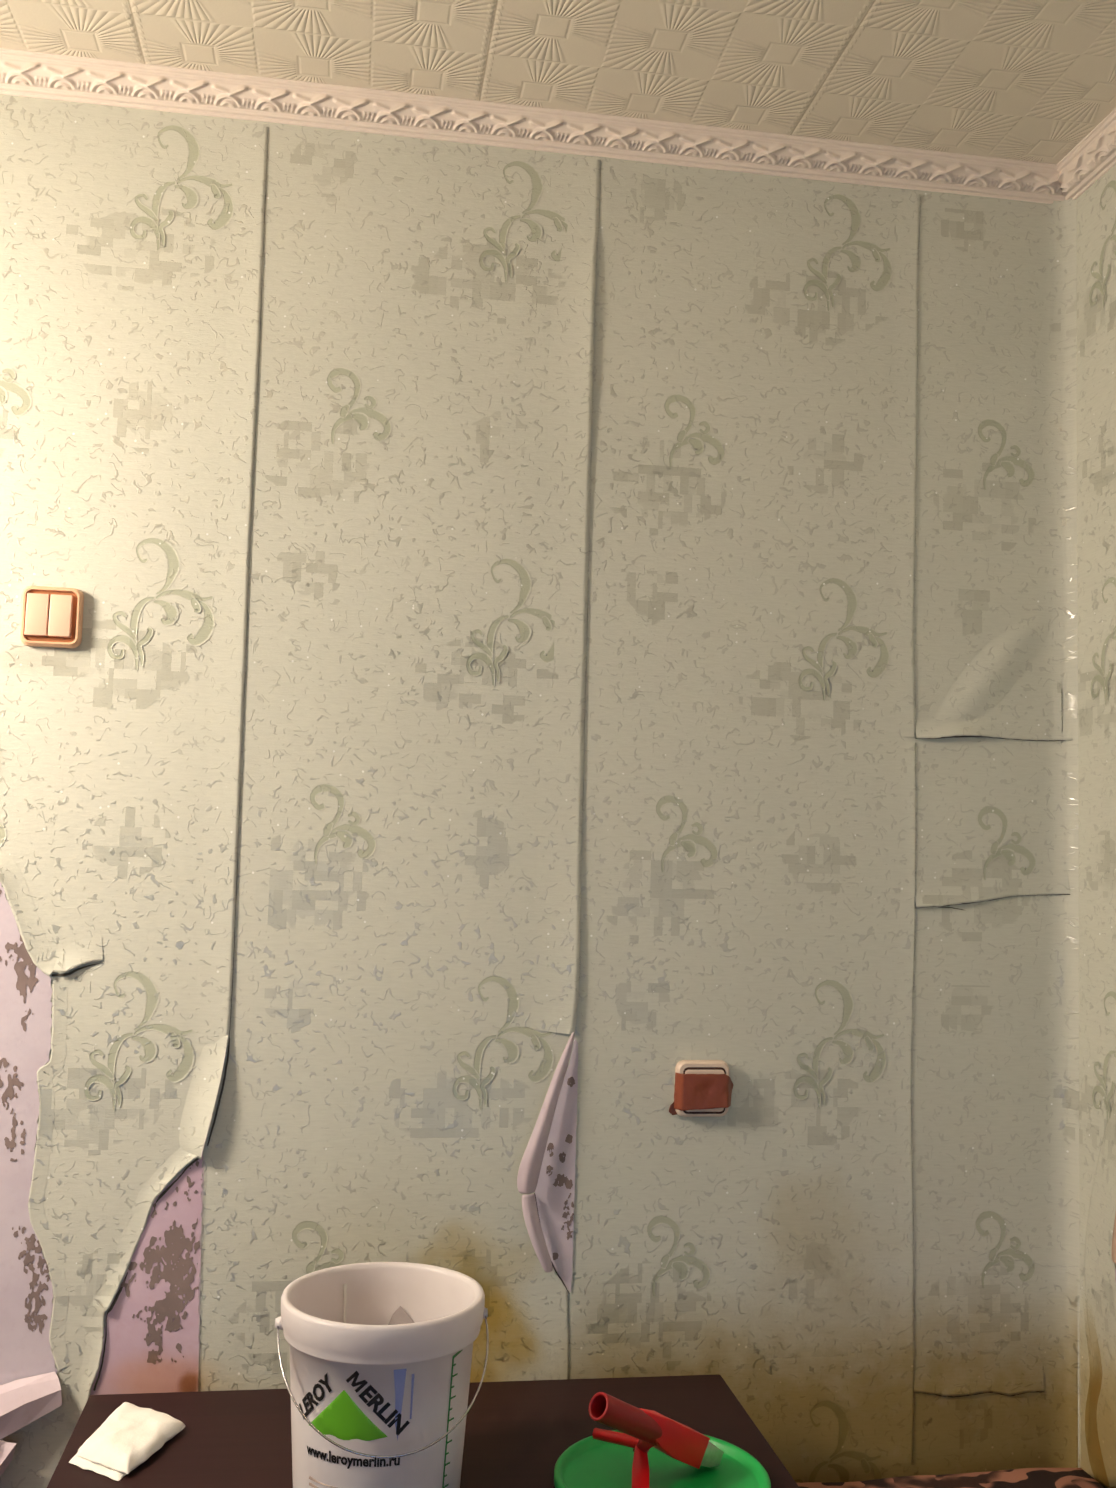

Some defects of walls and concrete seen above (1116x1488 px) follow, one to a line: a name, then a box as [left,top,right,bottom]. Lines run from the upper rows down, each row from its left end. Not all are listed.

flaking render [90,1155,203,1395]
flaking render [535,1038,578,1292]